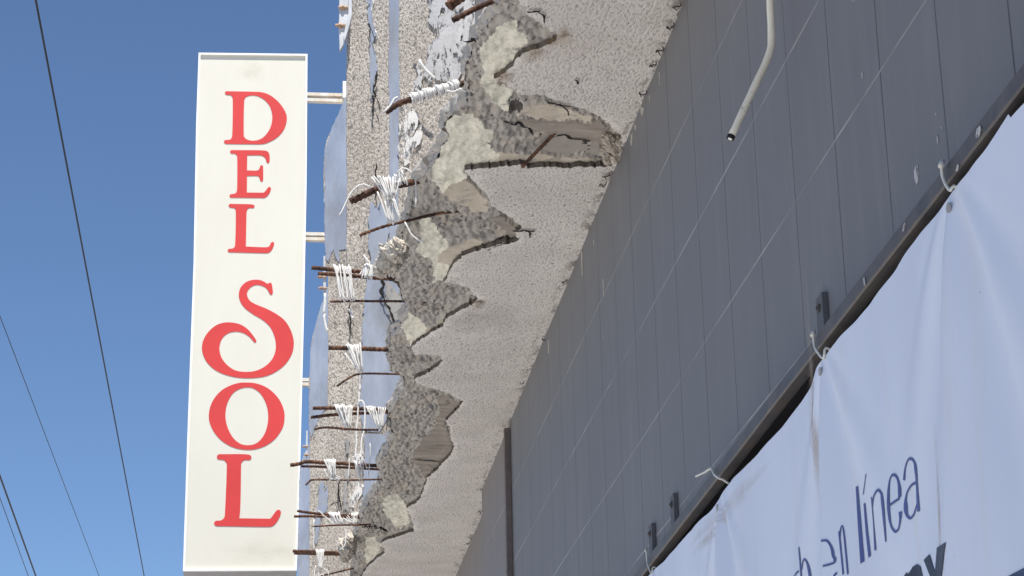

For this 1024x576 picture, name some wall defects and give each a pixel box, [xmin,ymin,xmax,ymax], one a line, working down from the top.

crack [372,71,380,119]
spalling [290,0,622,576]